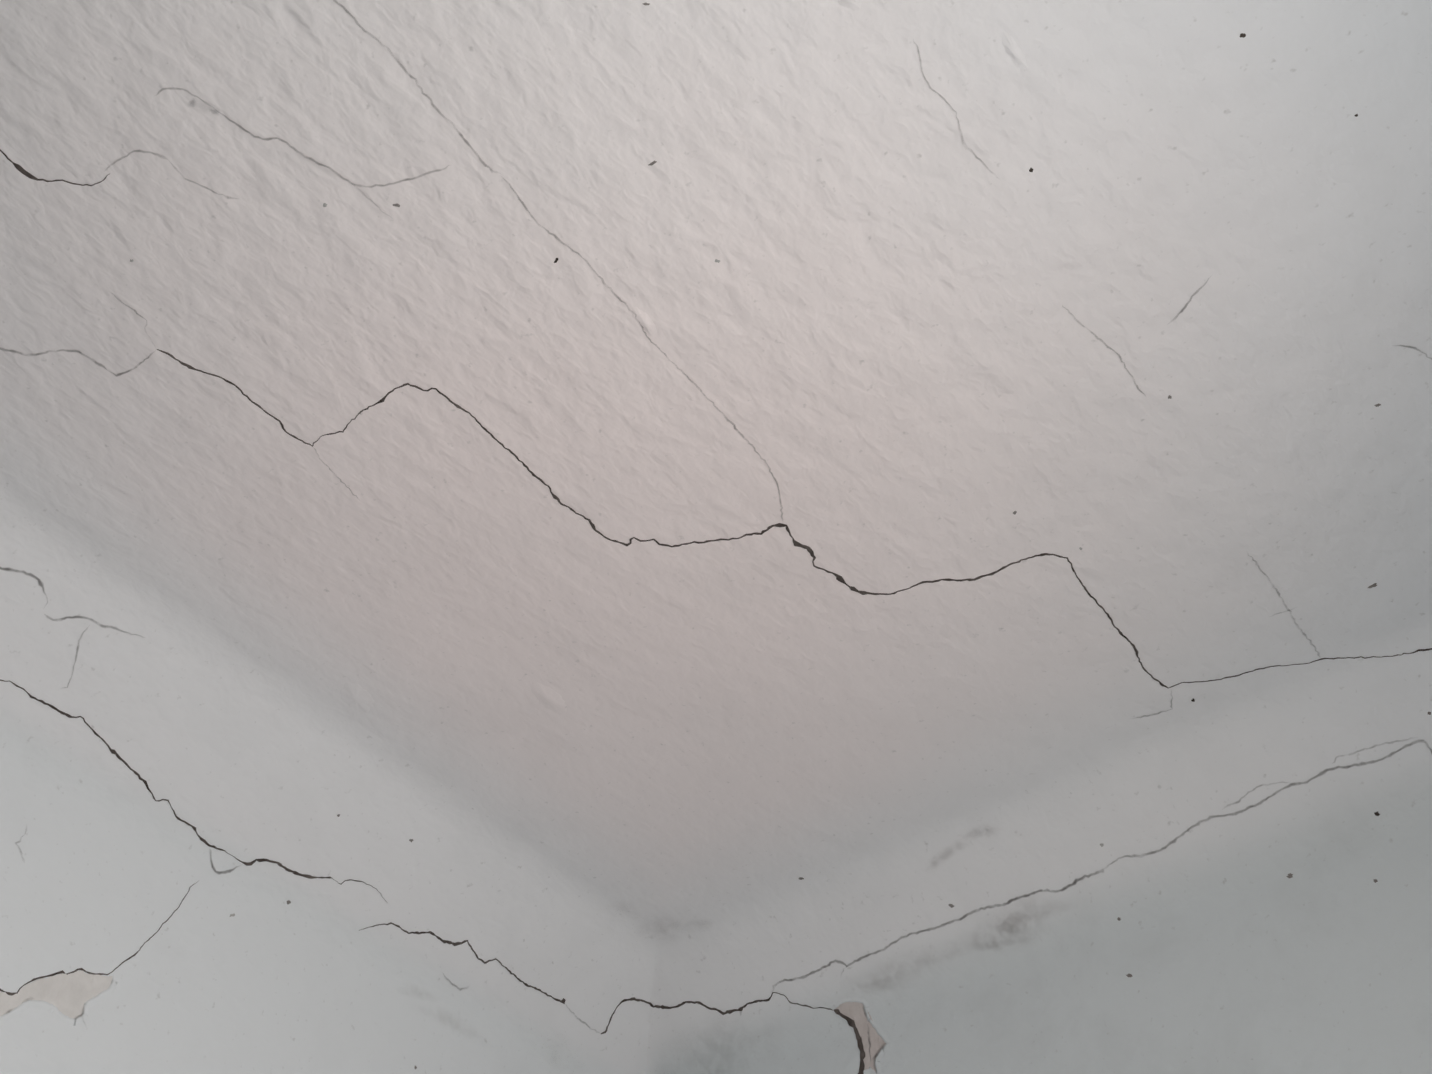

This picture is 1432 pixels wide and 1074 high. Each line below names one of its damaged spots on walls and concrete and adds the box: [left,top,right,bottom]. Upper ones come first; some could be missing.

crack [0,150,109,186]
crack [157,349,1432,688]
crack [0,679,566,1004]
crack [601,979,833,1034]
flaking render [832,998,891,1074]